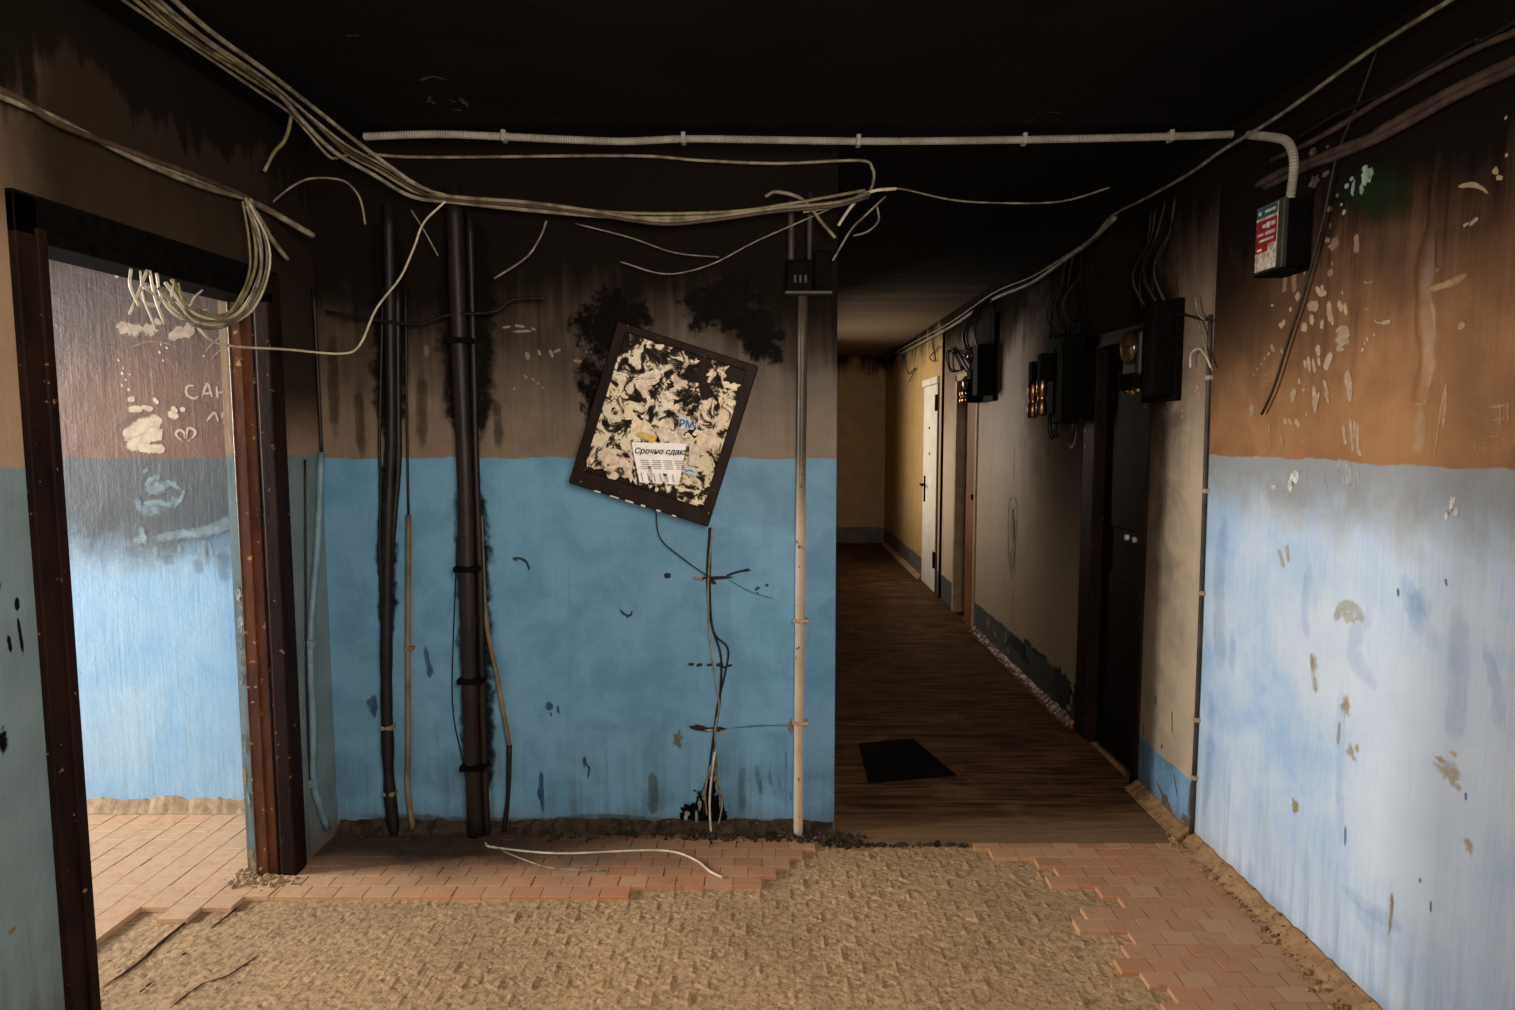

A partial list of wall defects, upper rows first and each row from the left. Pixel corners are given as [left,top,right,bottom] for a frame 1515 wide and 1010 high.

peeling [1309,170,1330,189]
peeling [1327,165,1374,229]